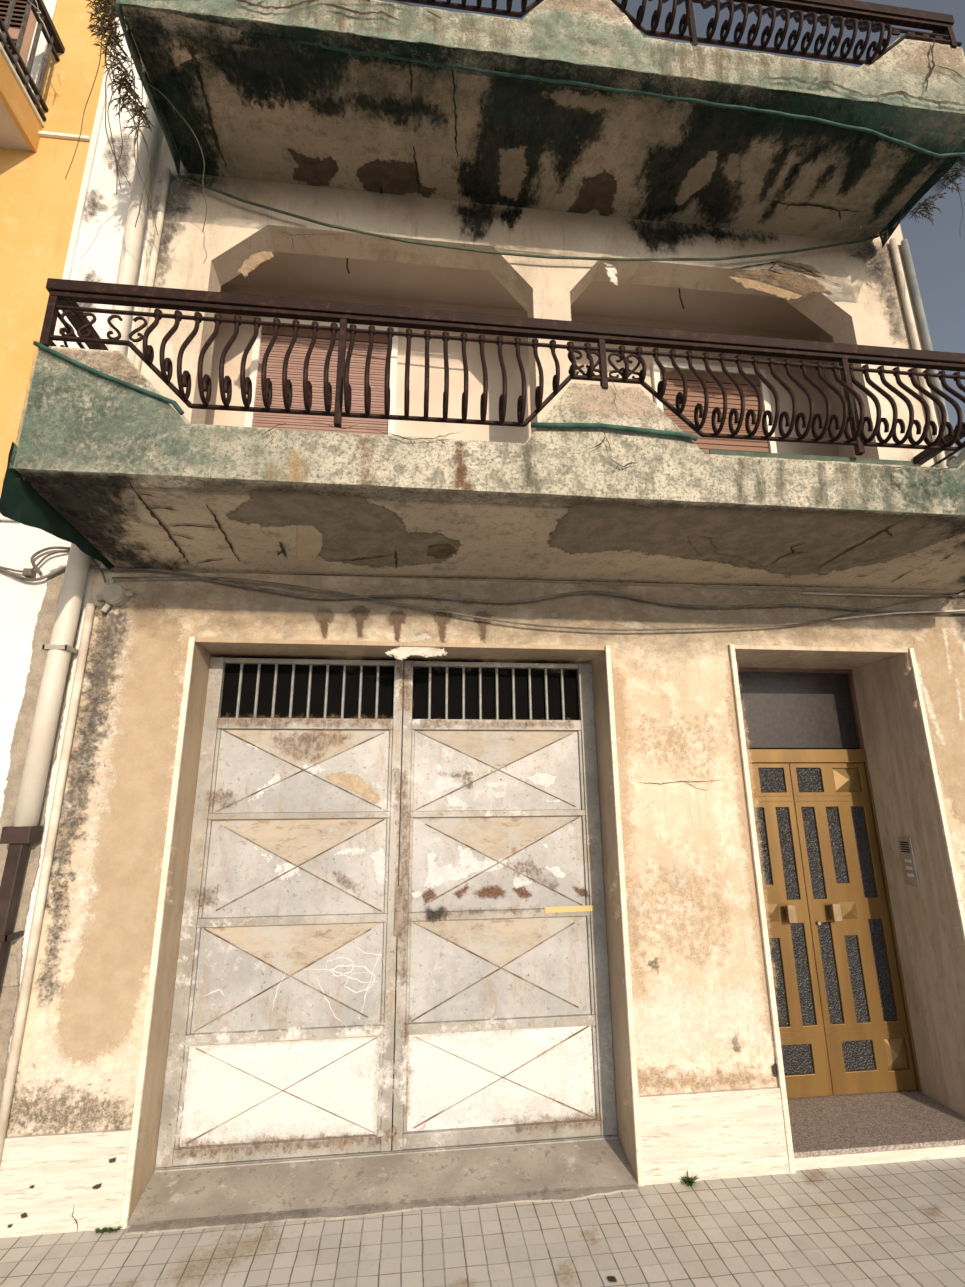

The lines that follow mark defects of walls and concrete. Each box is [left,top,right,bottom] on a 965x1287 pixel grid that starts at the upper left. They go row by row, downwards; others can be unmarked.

crack [760,38,965,108]
leakage [127,0,448,284]
spalling [357,159,436,198]
leakage [453,66,615,241]
spalling [727,260,832,300]
spalling [226,490,461,568]
crack [128,479,937,590]
spalling [547,502,965,578]
leakage [37,605,131,1000]
corrosion [396,774,451,951]
corrosion [456,862,555,914]
leakage [8,1032,136,1136]